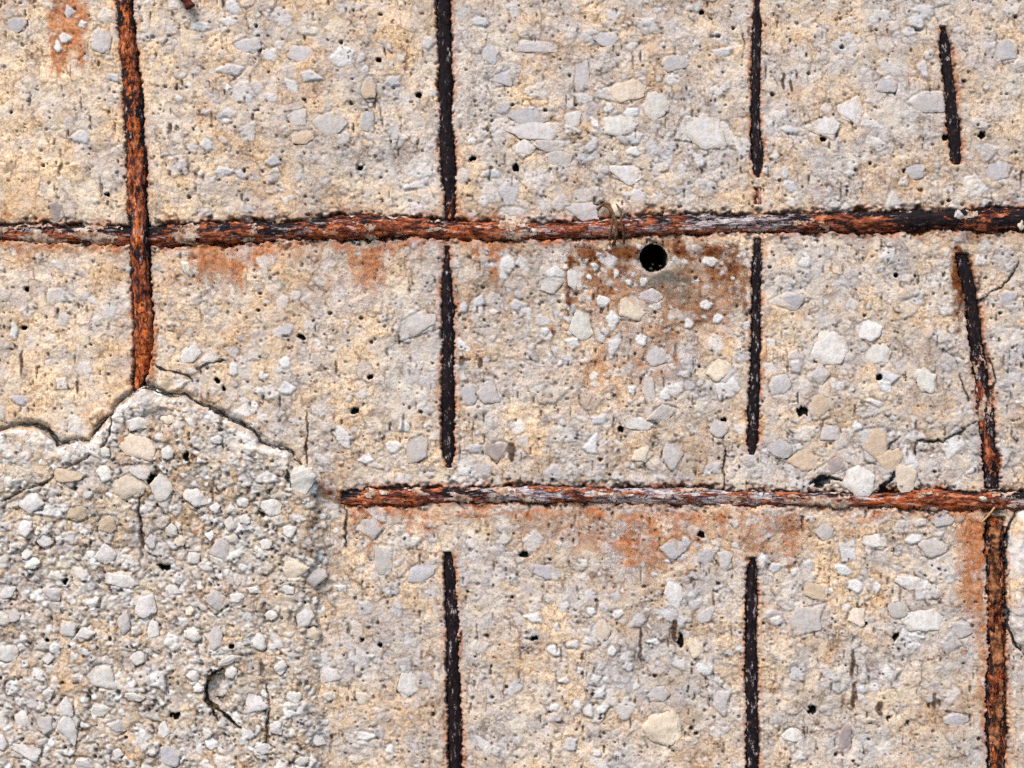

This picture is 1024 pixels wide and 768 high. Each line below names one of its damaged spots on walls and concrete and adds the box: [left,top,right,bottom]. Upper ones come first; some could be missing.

corrosion [190,242,300,284]
corrosion [565,243,639,305]
corrosion [664,239,747,323]
corrosion [951,236,971,331]
spalling [0,370,352,768]
corrosion [591,512,659,567]
corrosion [950,512,986,614]
crack [204,668,270,755]